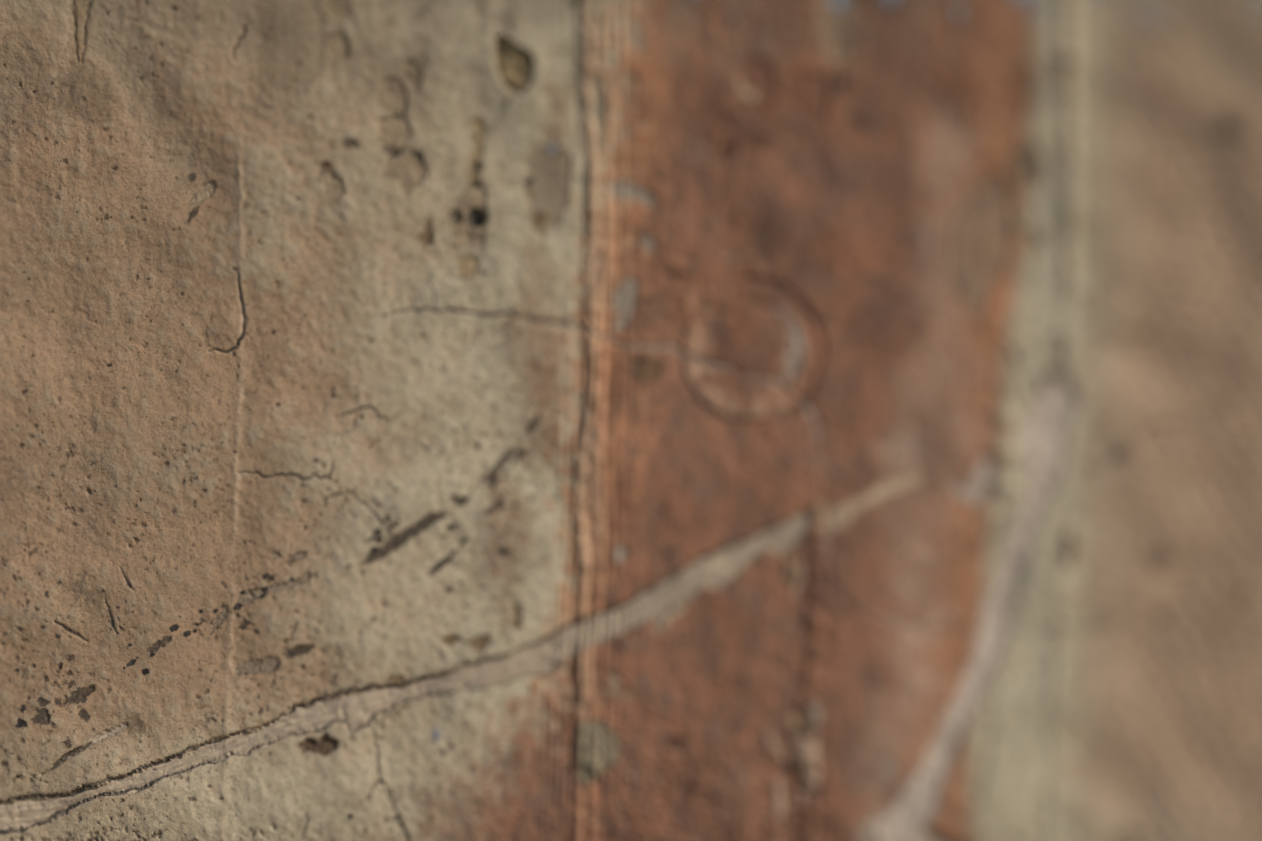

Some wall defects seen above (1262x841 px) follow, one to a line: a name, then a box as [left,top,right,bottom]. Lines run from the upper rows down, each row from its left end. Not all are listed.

spalling [342,139,360,149]
peeling [375,59,427,195]
spalling [417,219,435,246]
spalling [449,117,490,280]
spalling [494,35,535,94]
crack [340,406,396,435]
crack [238,465,384,530]
spalling [0,469,931,835]
leakage [859,366,1079,841]
crack [367,701,415,841]